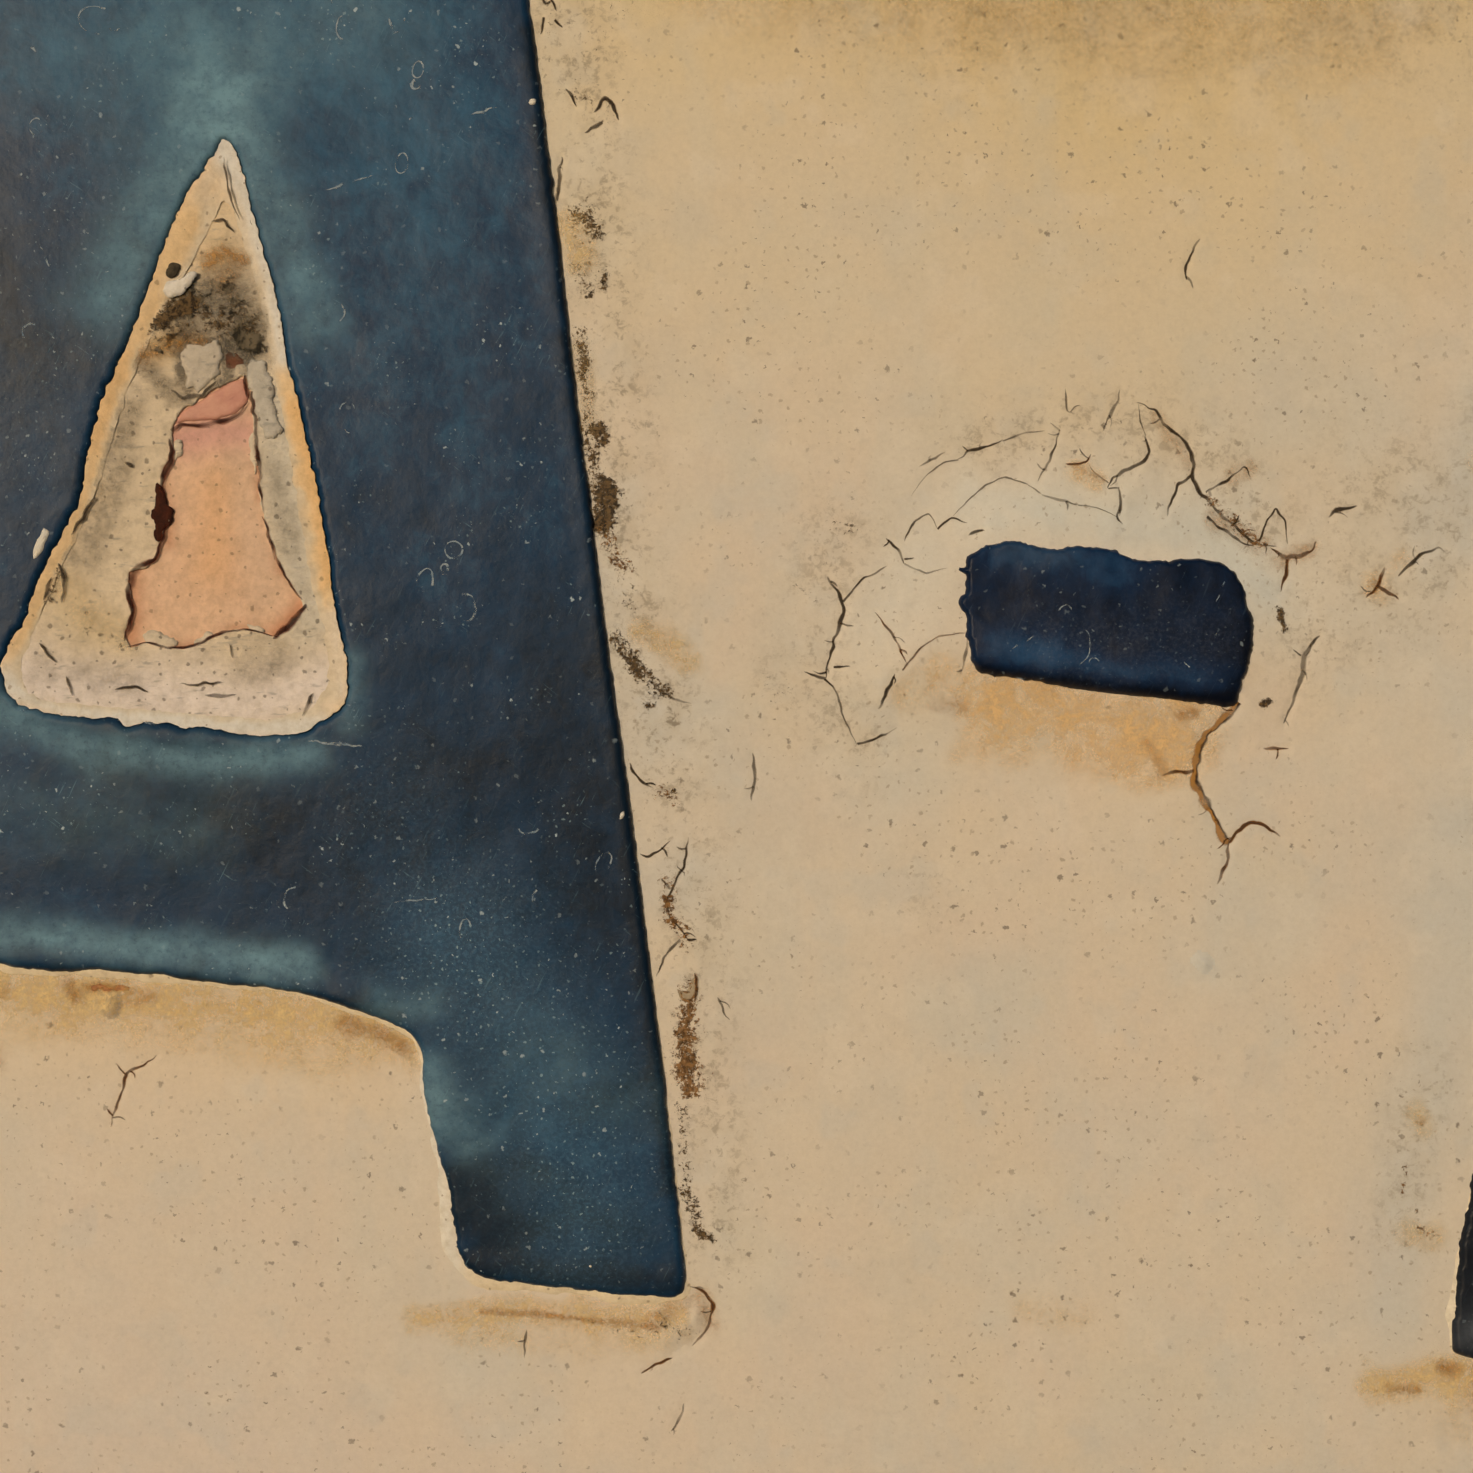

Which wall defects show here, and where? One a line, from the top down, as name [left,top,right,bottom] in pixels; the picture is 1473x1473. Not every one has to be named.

peeling [0,139,348,736]
crack [806,392,1356,759]
corrosion [961,677,1202,779]
crack [1169,702,1277,875]